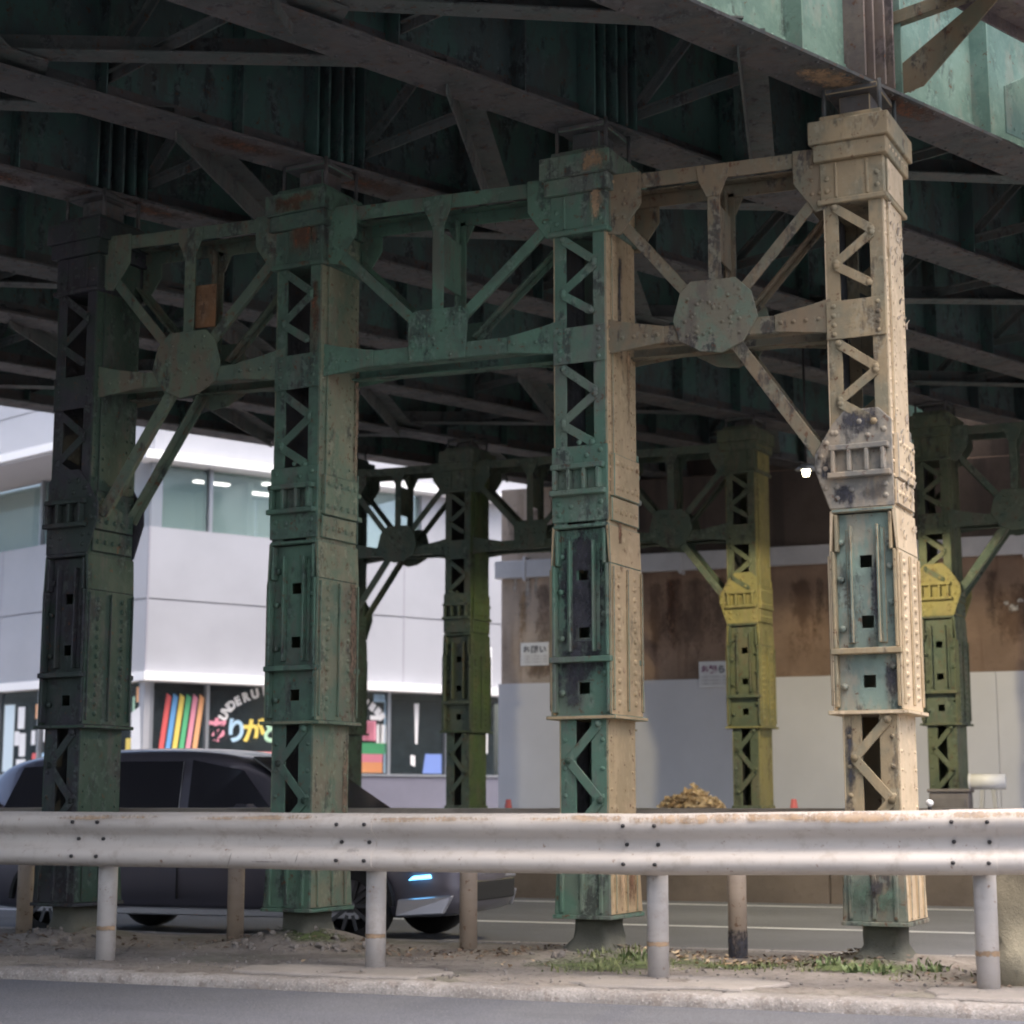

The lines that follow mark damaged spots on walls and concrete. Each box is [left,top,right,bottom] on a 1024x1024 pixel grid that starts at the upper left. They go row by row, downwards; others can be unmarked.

peeling [841,408,878,434]
peeling [835,486,855,504]
damp [558,523,603,706]
damp [885,666,898,694]
damp [845,726,856,811]